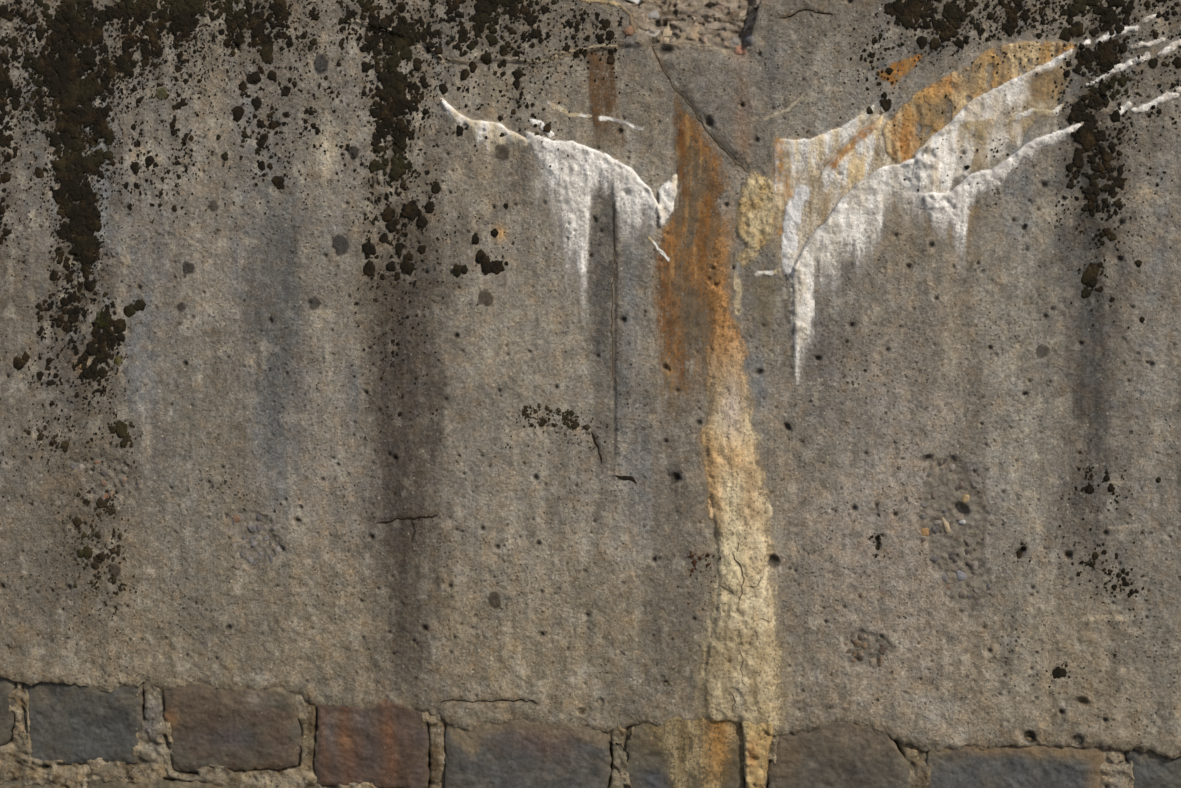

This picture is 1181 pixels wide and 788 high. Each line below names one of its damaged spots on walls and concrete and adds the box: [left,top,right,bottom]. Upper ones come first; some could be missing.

damp [440,98,678,291]
damp [504,44,618,65]
rust [655,98,727,395]
crack [650,44,748,172]
damp [646,14,1181,788]